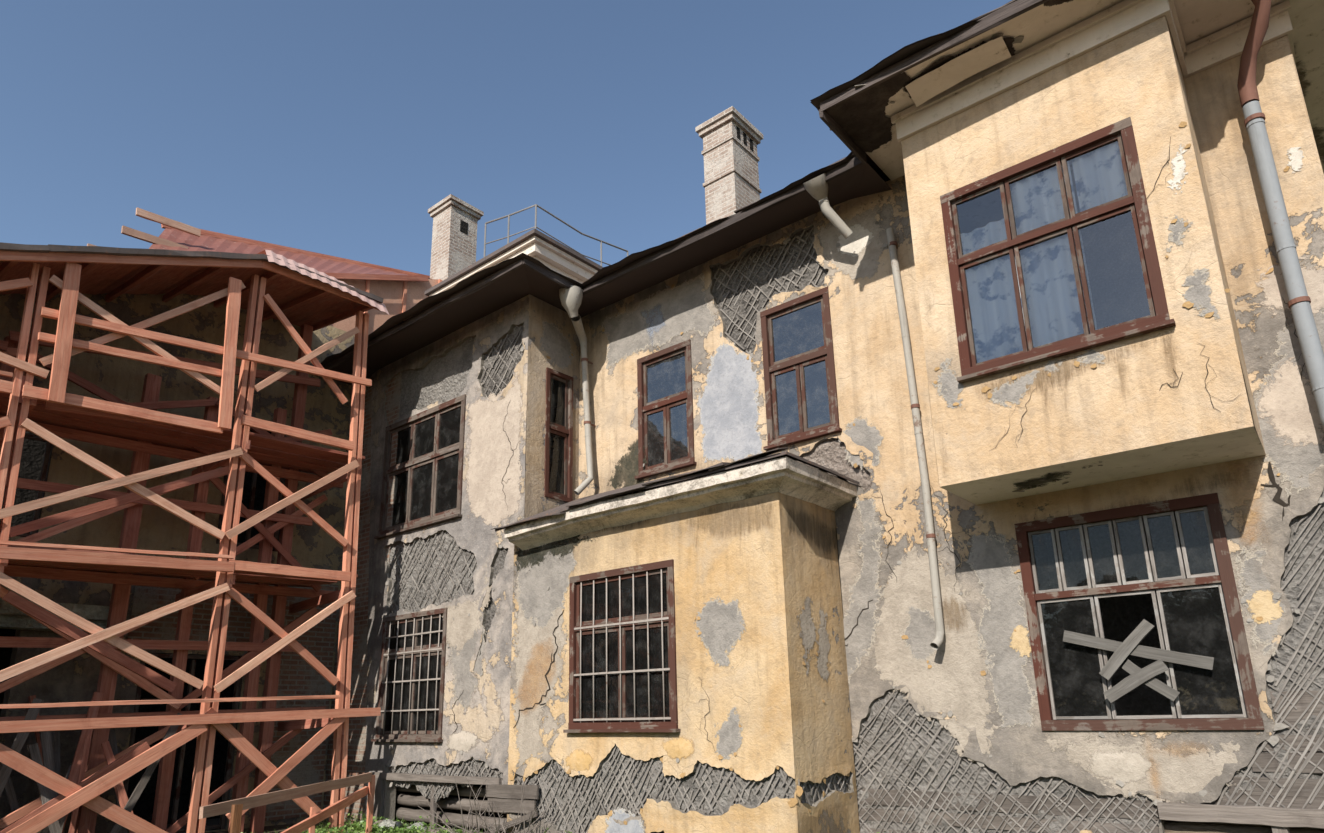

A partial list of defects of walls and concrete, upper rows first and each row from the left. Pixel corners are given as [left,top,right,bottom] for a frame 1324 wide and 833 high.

water stain [1294,46,1310,97]
water stain [1312,127,1324,162]
peeling [1165,213,1194,258]
flaking render [601,202,888,463]
flaking render [382,255,1324,833]
crack [513,610,564,728]